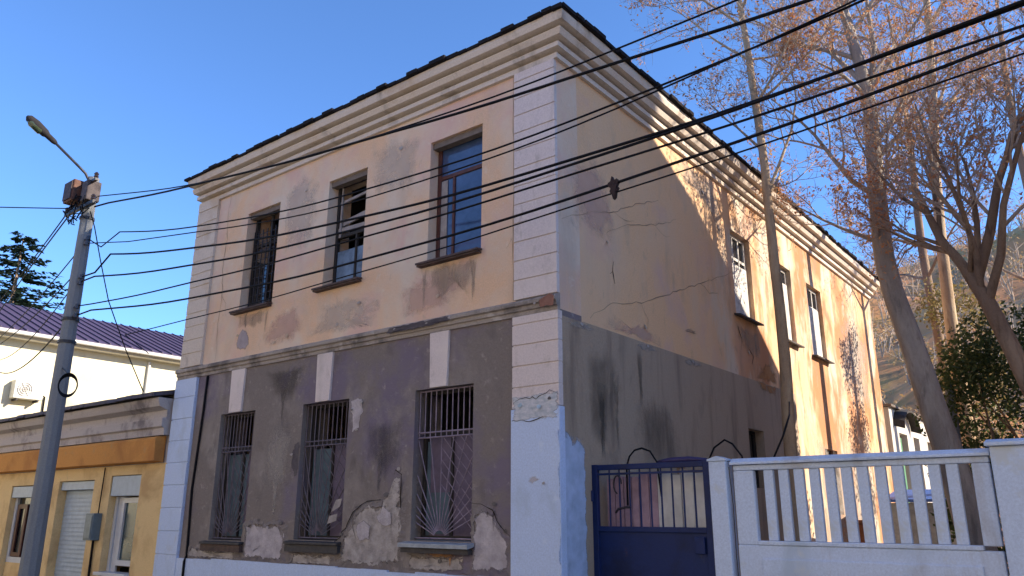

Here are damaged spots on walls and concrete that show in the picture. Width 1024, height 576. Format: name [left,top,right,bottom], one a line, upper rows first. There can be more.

crack [591,262,733,317]
flaking render [351,398,363,432]
peeling [512,390,558,422]
spalling [184,467,511,576]